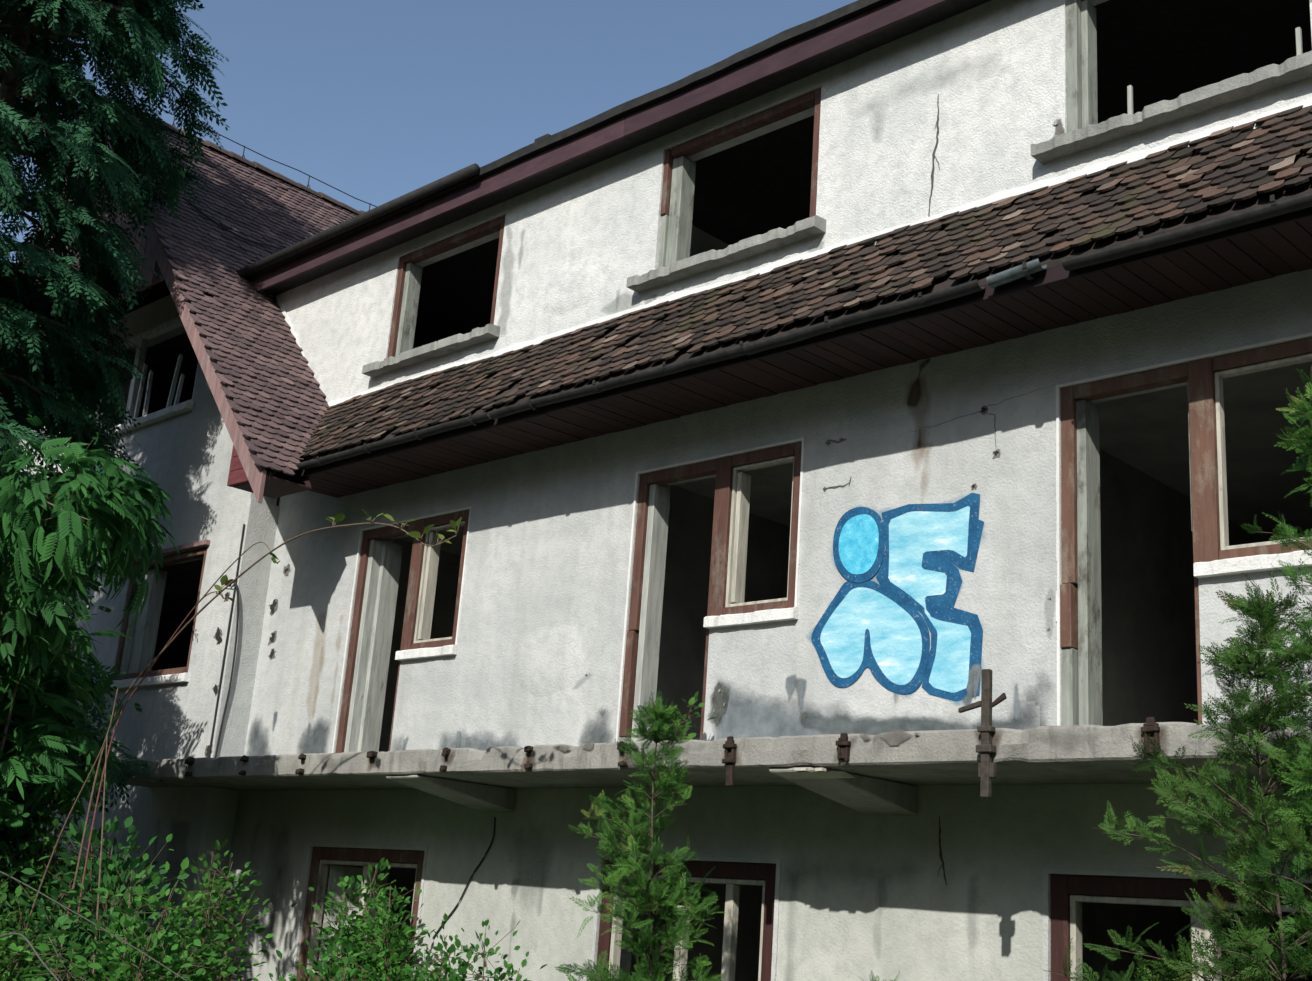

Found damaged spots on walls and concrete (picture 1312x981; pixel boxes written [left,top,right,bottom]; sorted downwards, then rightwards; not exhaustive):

crack [928,94,940,217]
water stain [963,664,981,705]
water stain [710,675,1037,739]
water stain [249,712,277,756]
water stain [300,722,328,754]